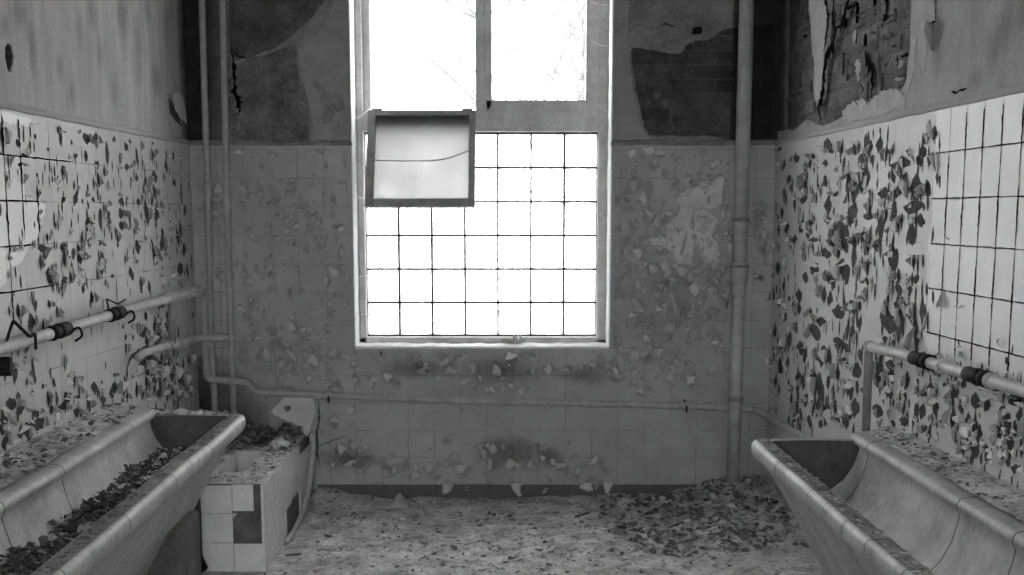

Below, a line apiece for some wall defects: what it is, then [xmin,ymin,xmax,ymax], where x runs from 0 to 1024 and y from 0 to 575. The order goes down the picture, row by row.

peeling [0,111,198,451]
crack [229,50,248,115]
flaking render [227,0,351,140]
peeling [271,0,736,497]
peeling [748,0,1024,488]